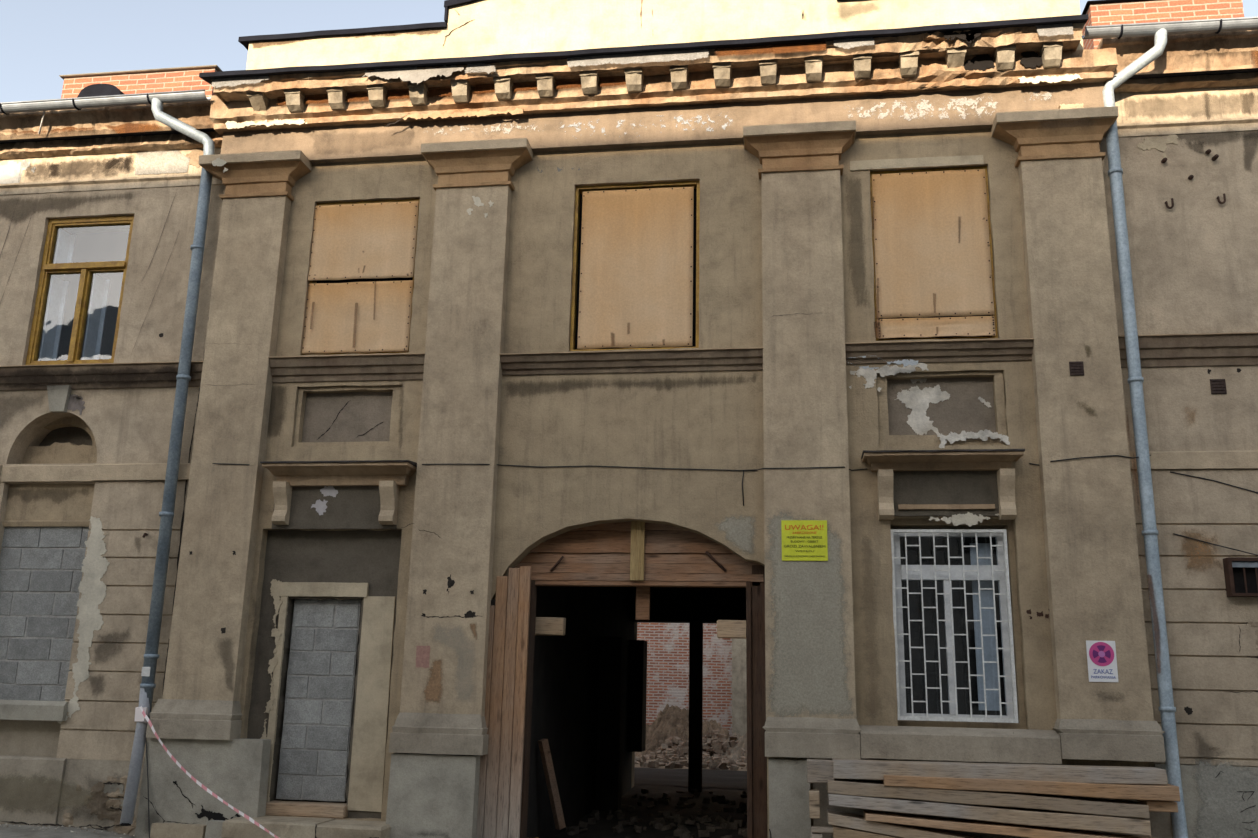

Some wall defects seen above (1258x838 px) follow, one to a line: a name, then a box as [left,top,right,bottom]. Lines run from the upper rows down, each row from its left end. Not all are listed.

flaking render [400,108,732,137]
peeling [844,97,998,121]
crack [317,400,383,440]
peeling [847,354,1010,448]
peeling [311,486,338,515]
flaking render [929,512,1000,527]
peeling [260,579,283,739]
flaking render [76,775,136,834]